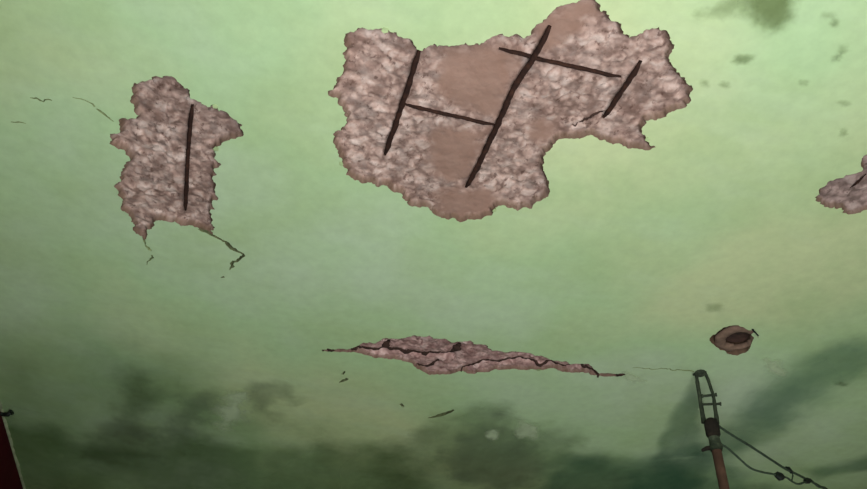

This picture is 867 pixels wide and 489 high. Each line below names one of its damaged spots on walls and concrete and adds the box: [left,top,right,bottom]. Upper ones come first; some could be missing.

spalling [328,0,693,222]
spalling [109,76,244,240]
spalling [815,155,867,214]
crack [198,227,245,278]
spalling [322,335,625,378]